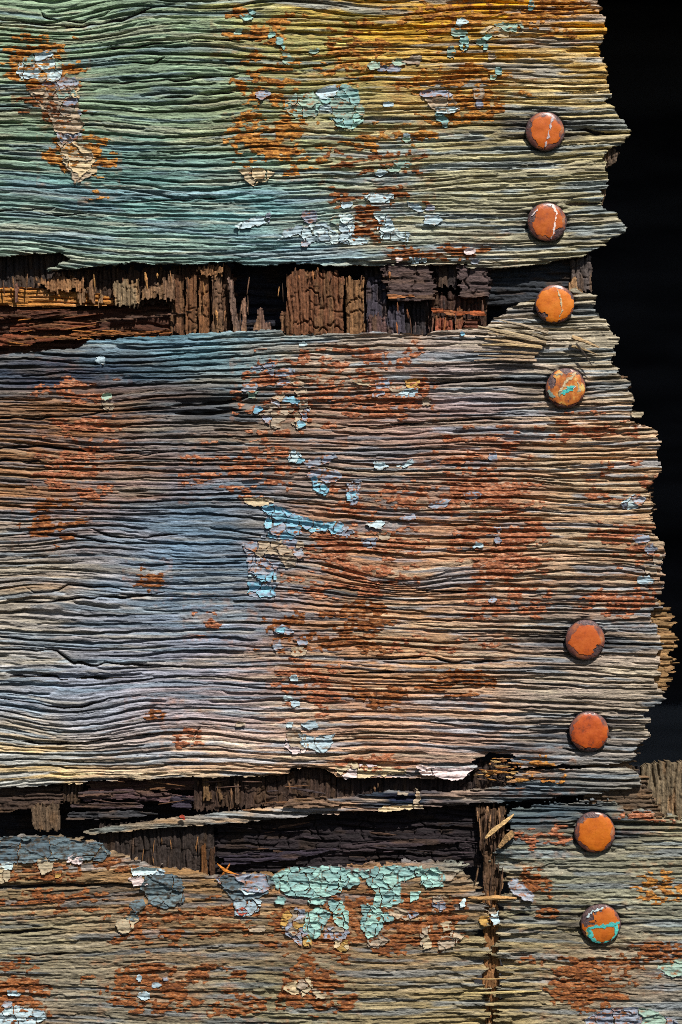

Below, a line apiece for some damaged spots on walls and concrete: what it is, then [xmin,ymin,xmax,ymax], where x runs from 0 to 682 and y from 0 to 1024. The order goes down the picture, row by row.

peeling [16,50,97,184]
peeling [284,84,364,129]
rust [221,7,532,262]
peeling [242,497,391,597]
peeling [0,836,111,884]
peeling [115,867,185,934]
peeling [215,865,464,952]
peeling [283,977,325,999]